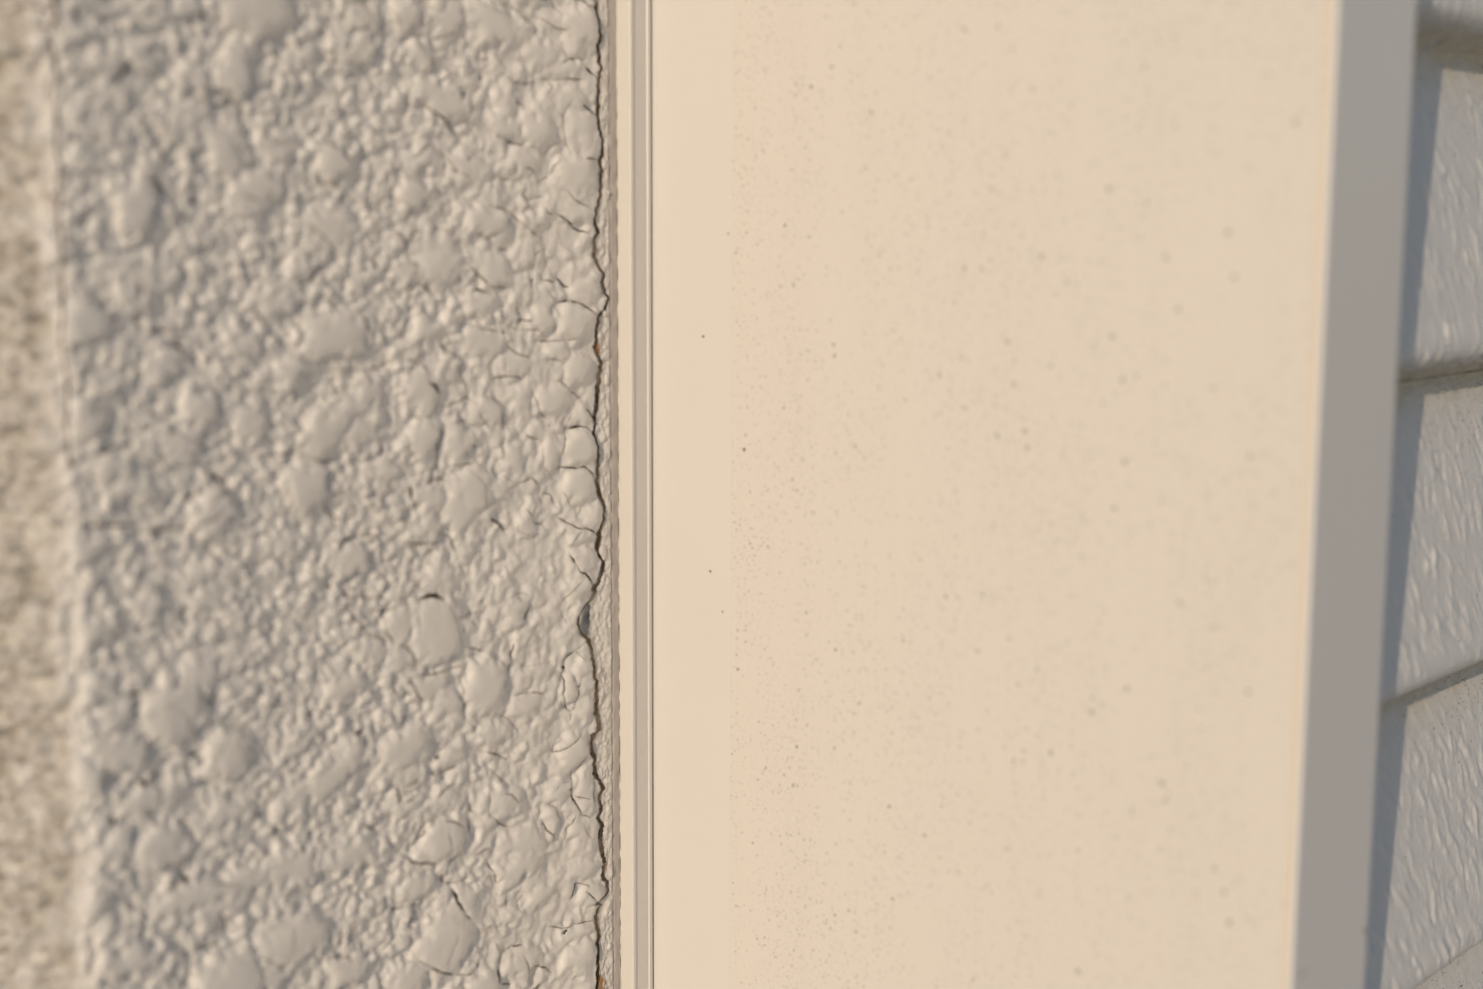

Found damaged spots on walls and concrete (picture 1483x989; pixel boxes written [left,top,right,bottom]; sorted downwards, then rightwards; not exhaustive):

crack [18,0,130,468]
crack [50,470,240,567]
crack [272,0,610,989]
crack [111,772,163,827]
crack [126,860,242,948]